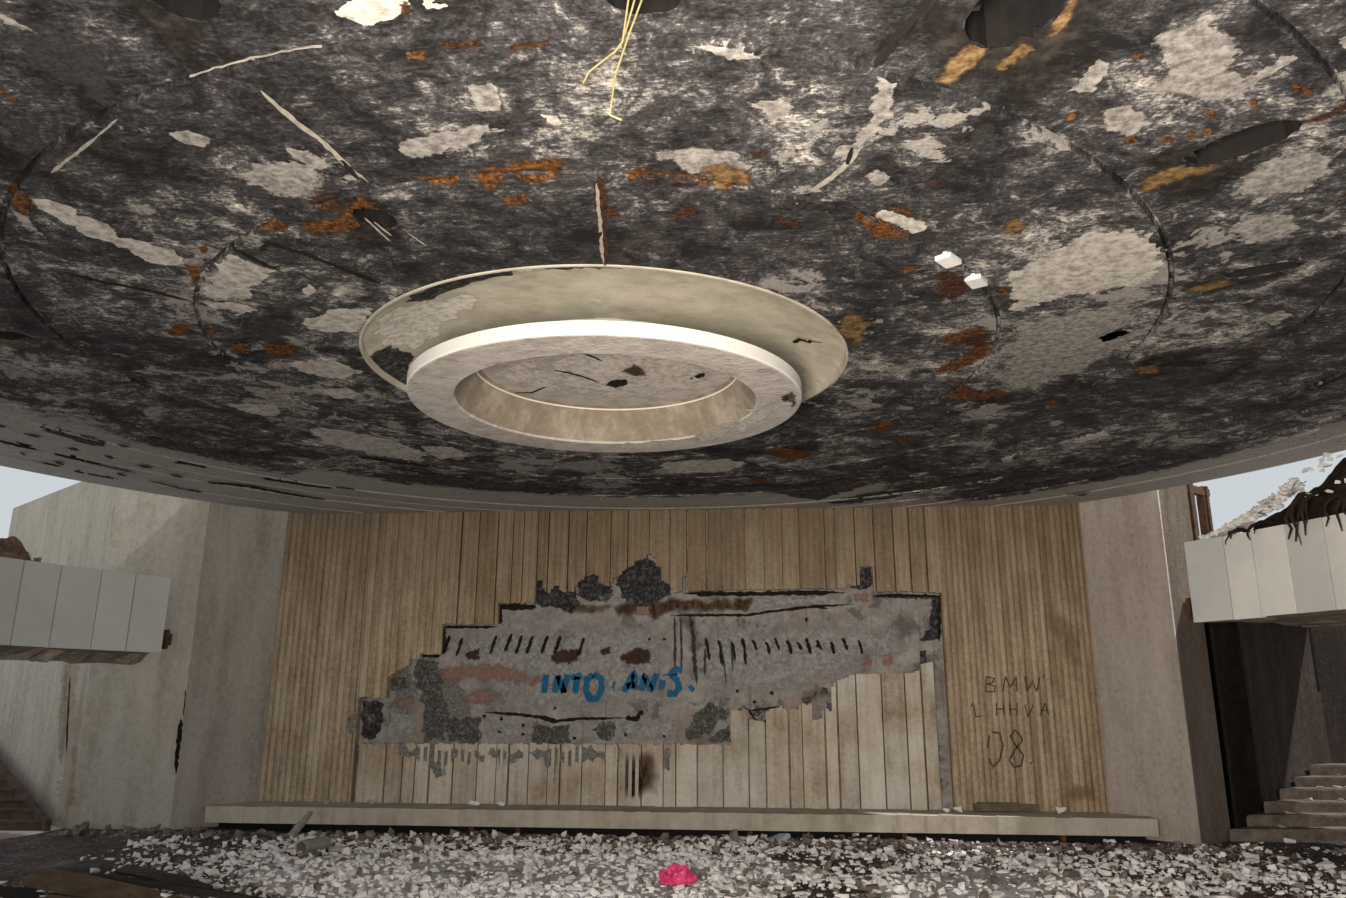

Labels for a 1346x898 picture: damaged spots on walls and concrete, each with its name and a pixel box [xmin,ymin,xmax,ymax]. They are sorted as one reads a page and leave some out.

corrosion [1050,0,1077,37]
corrosion [937,44,986,84]
corrosion [996,44,1035,70]
flaking render [169,130,210,147]
flaking render [233,144,331,198]
corrosion [419,159,563,207]
corrosion [624,149,769,189]
corrosion [1139,164,1219,193]
flaking render [11,198,277,318]
flaking render [966,228,1167,419]
flaking render [1074,428,1110,443]
flaking render [347,557,942,780]